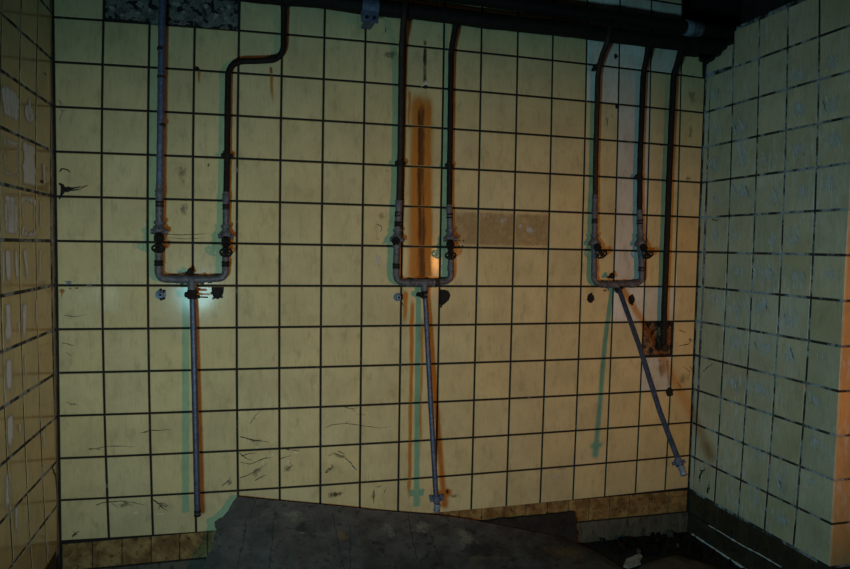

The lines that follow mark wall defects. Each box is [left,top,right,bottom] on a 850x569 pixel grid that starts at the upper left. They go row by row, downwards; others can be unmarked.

corrosion [408,92,432,277]
corrosion [403,292,423,492]